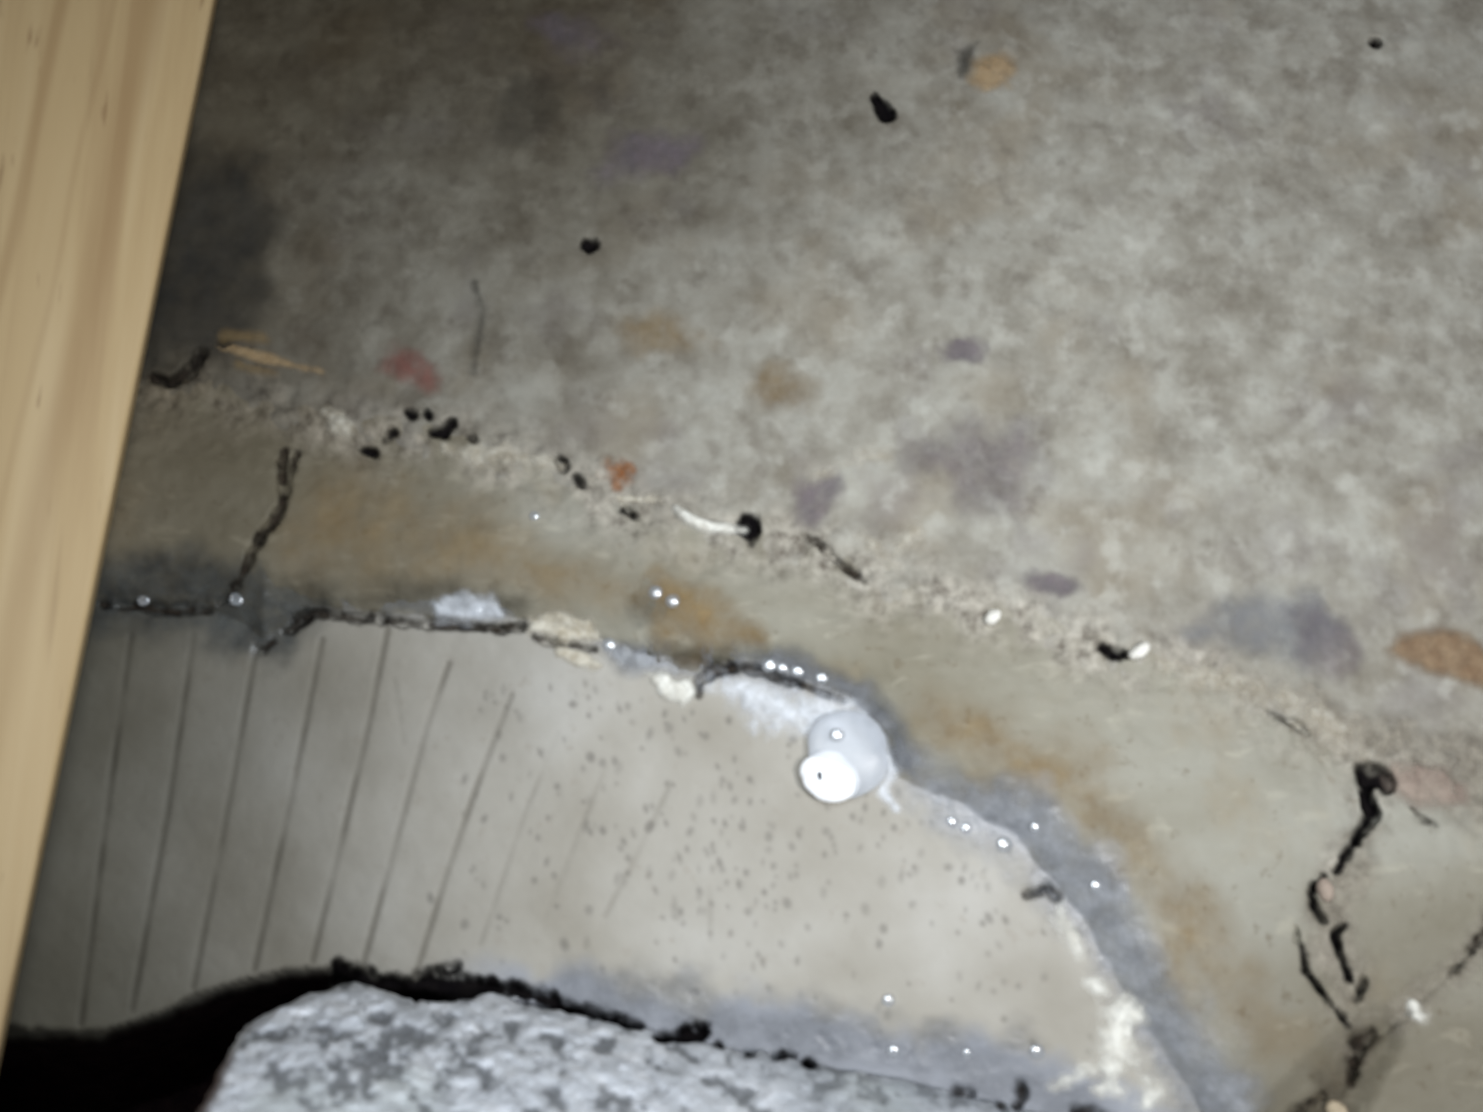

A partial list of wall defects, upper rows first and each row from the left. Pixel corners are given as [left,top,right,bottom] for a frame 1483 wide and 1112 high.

crack [149,352,207,388]
crack [101,448,301,616]
spalling [1098,643,1127,661]
leakage [529,612,1251,1112]
crack [1299,764,1431,1087]
crack [1470,933,1483,954]
hole [0,973,332,1112]